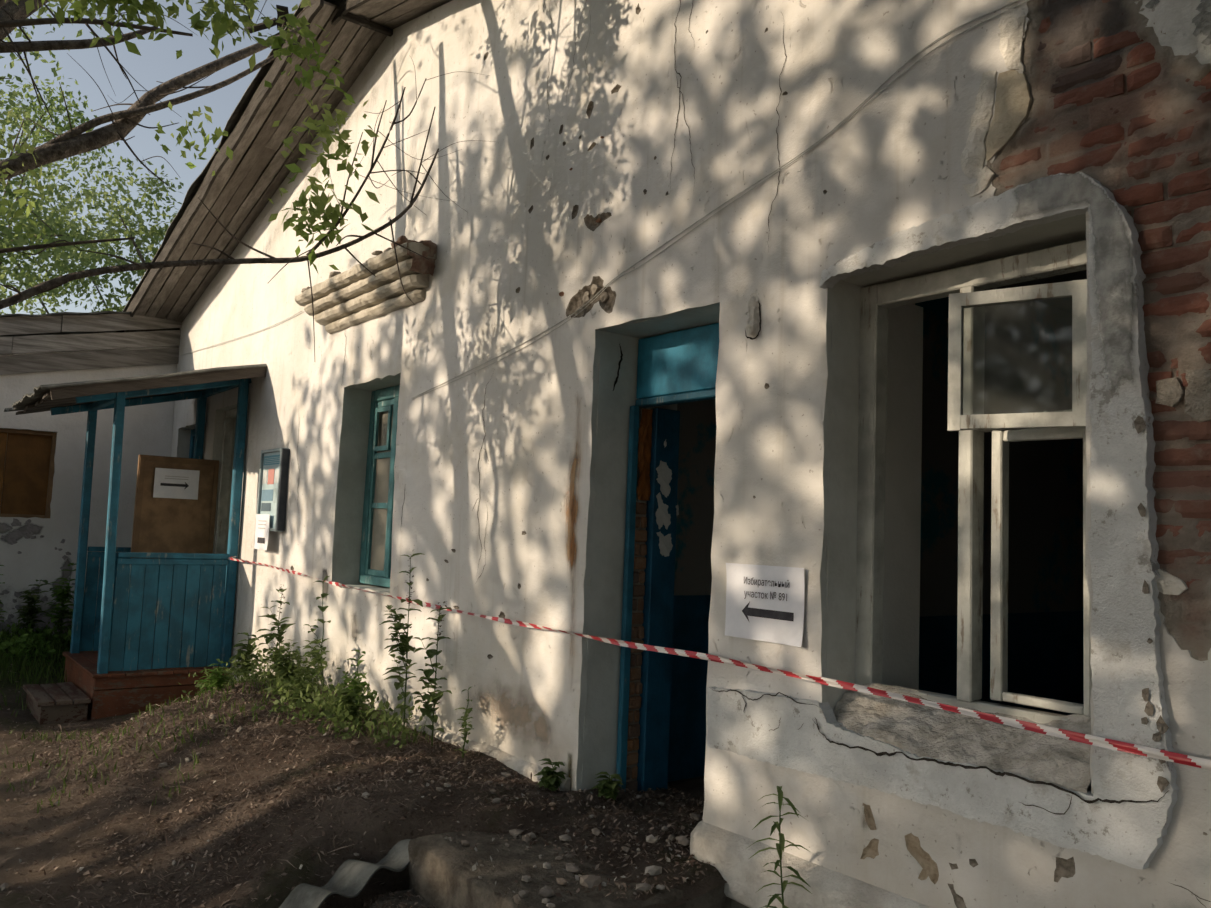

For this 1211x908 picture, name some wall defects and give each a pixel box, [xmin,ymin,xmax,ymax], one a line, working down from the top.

crack [670,0,695,189]
crack [767,12,787,252]
flaking render [572,205,612,231]
flaking render [559,276,616,318]
flaking render [961,0,1211,661]
peeling [0,518,44,554]
crack [472,374,493,584]
corrosion [566,451,578,569]
crack [709,687,1169,815]
peeling [1141,688,1169,793]
peeling [860,803,879,859]
peeling [905,833,978,908]